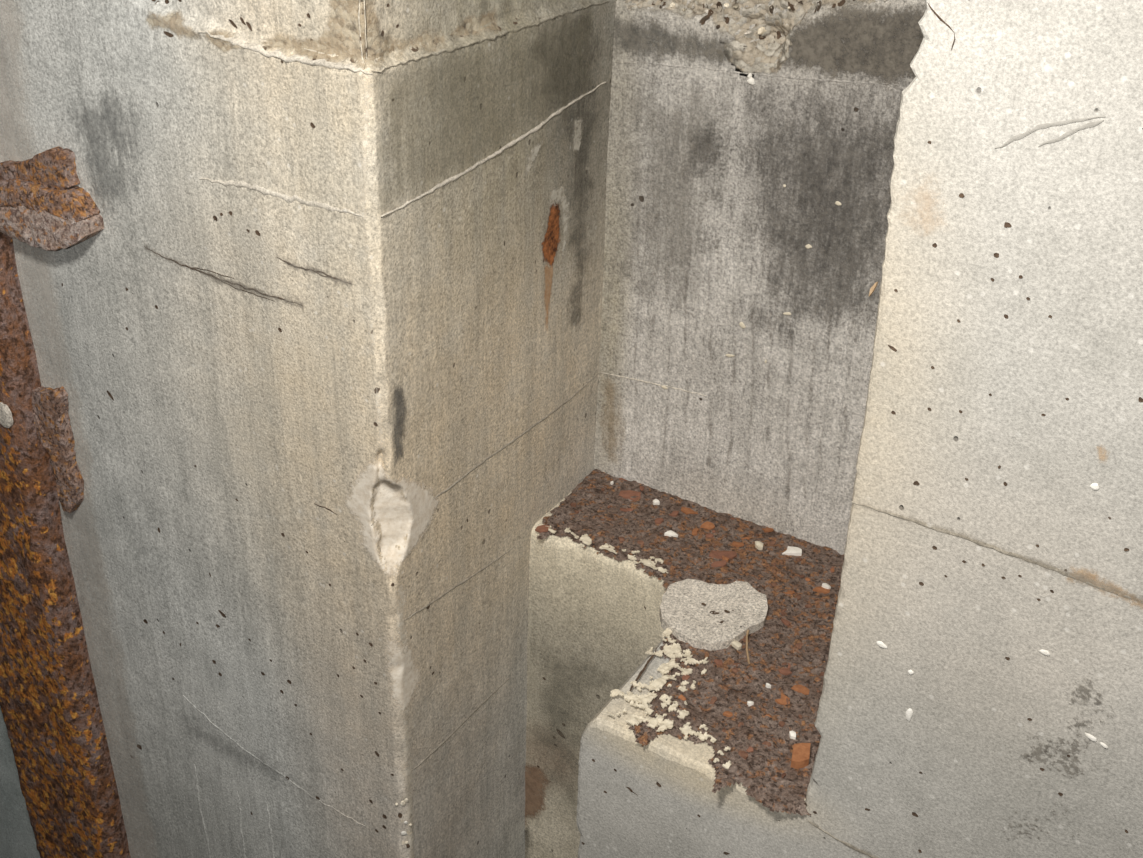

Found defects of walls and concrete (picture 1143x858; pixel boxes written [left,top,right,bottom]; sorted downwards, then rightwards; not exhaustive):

damp [614,19,736,63]
spalling [724,27,792,85]
damp [783,6,924,85]
crack [144,246,303,306]
crack [279,258,351,284]
rust [542,187,569,322]
damp [747,97,899,338]
spalling [345,455,439,586]
spalling [387,641,440,710]
rust [535,469,844,816]